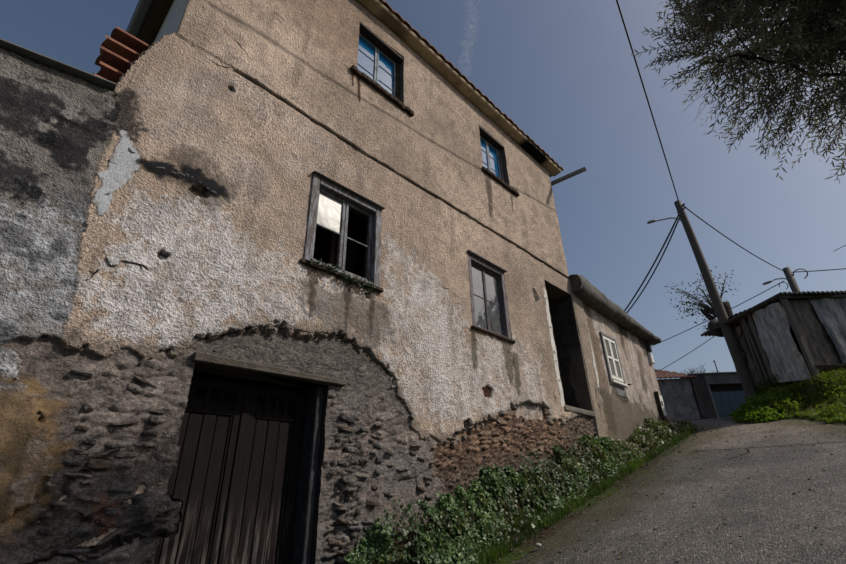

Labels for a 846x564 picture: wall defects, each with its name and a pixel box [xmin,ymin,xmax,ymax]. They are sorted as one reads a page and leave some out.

water stain [0,151,48,205]
water stain [0,76,150,170]
crack [188,5,560,274]
crack [120,260,150,272]
water stain [503,343,521,394]
water stain [0,379,62,535]
flaking render [0,287,603,564]